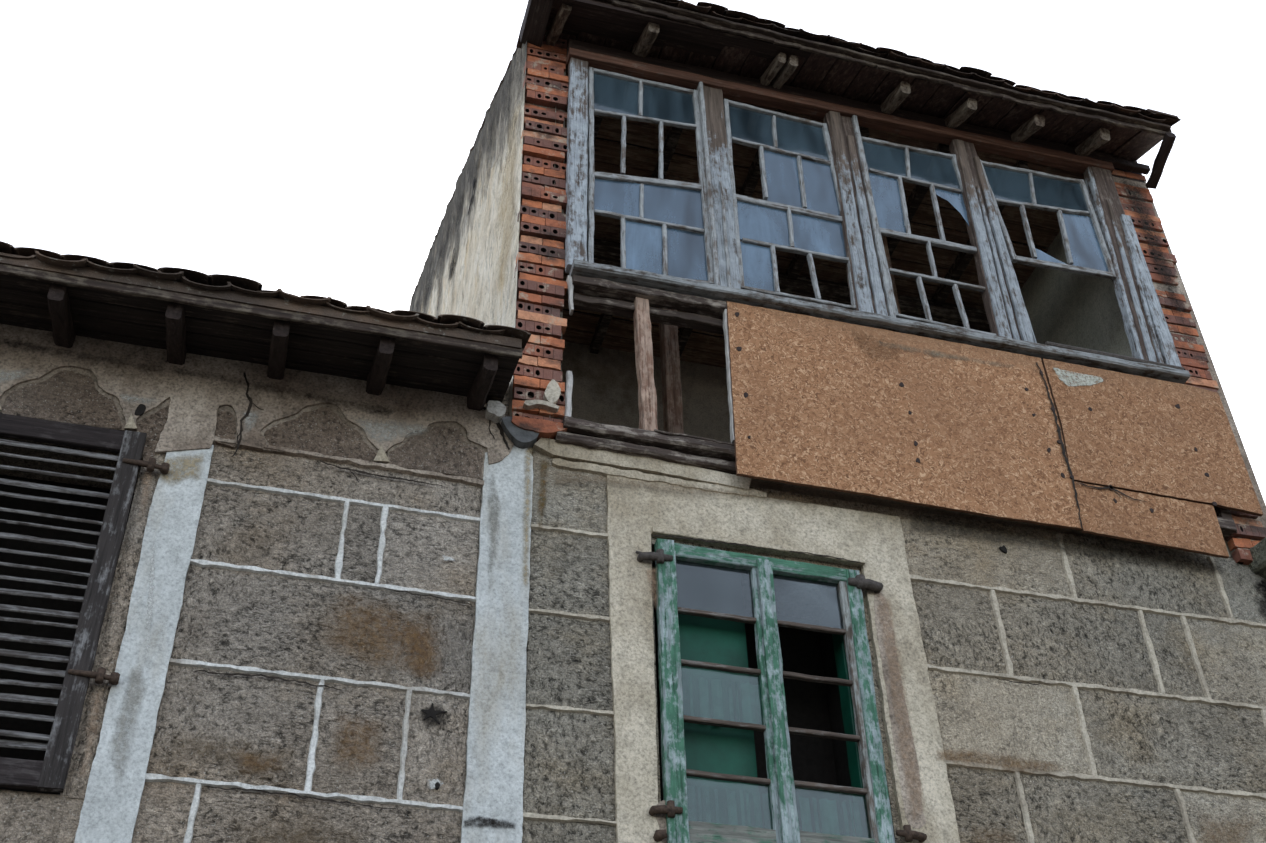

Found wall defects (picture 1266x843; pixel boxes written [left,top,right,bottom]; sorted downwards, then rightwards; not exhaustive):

crack [231,372,263,457]